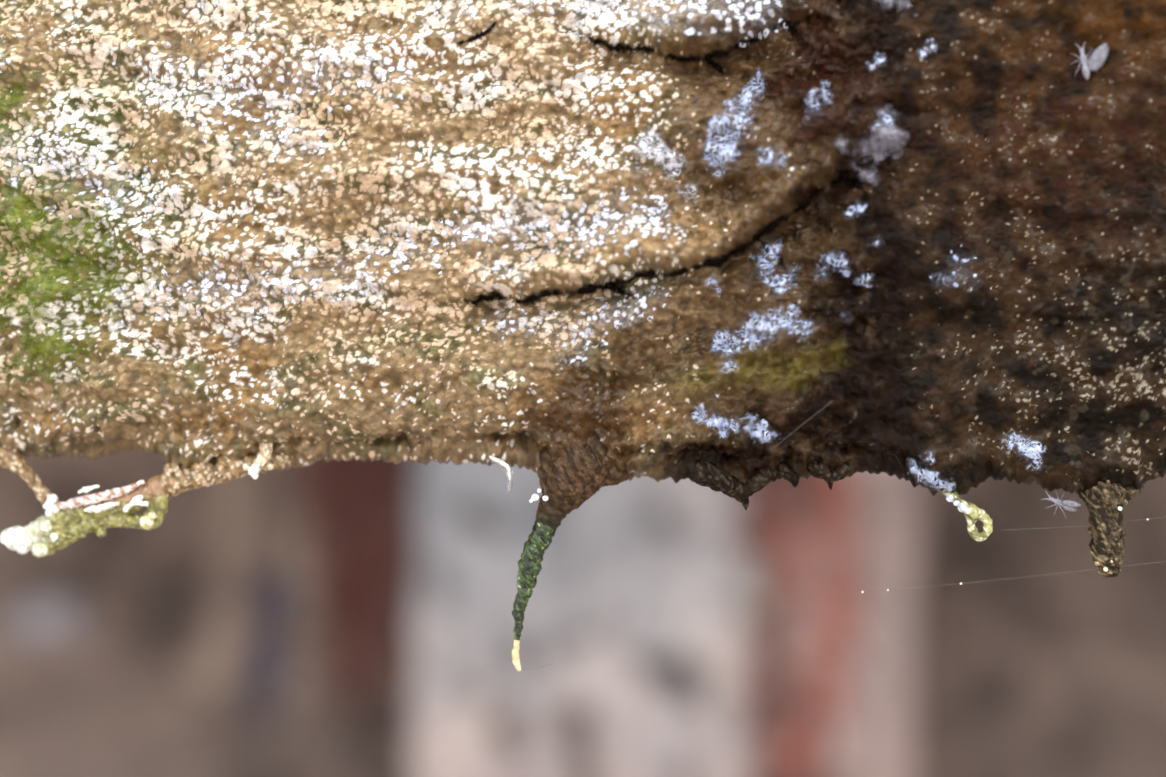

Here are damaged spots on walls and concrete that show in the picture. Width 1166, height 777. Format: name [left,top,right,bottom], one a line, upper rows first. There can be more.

crack [580,15,819,76]
damp [0,130,179,219]
crack [463,154,870,306]
damp [1009,433,1045,469]
damp [48,480,149,514]